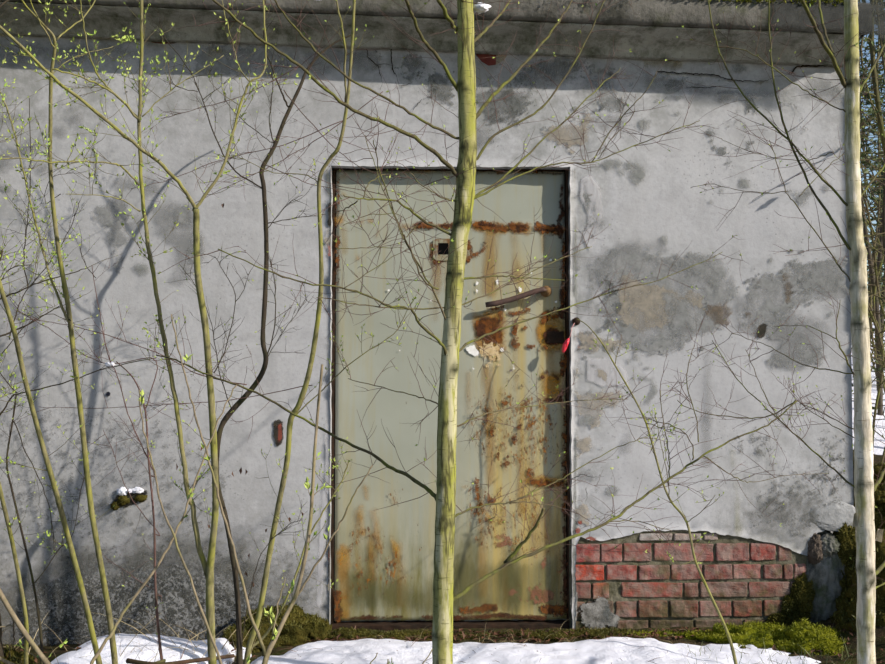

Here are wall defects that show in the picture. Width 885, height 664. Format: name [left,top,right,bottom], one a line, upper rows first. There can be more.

crack [657,65,834,88]
rust [415,222,453,230]
rust [453,186,568,621]
peeling [576,244,848,457]
damp [0,532,276,646]
rust [333,516,413,623]
flaking render [569,504,856,629]